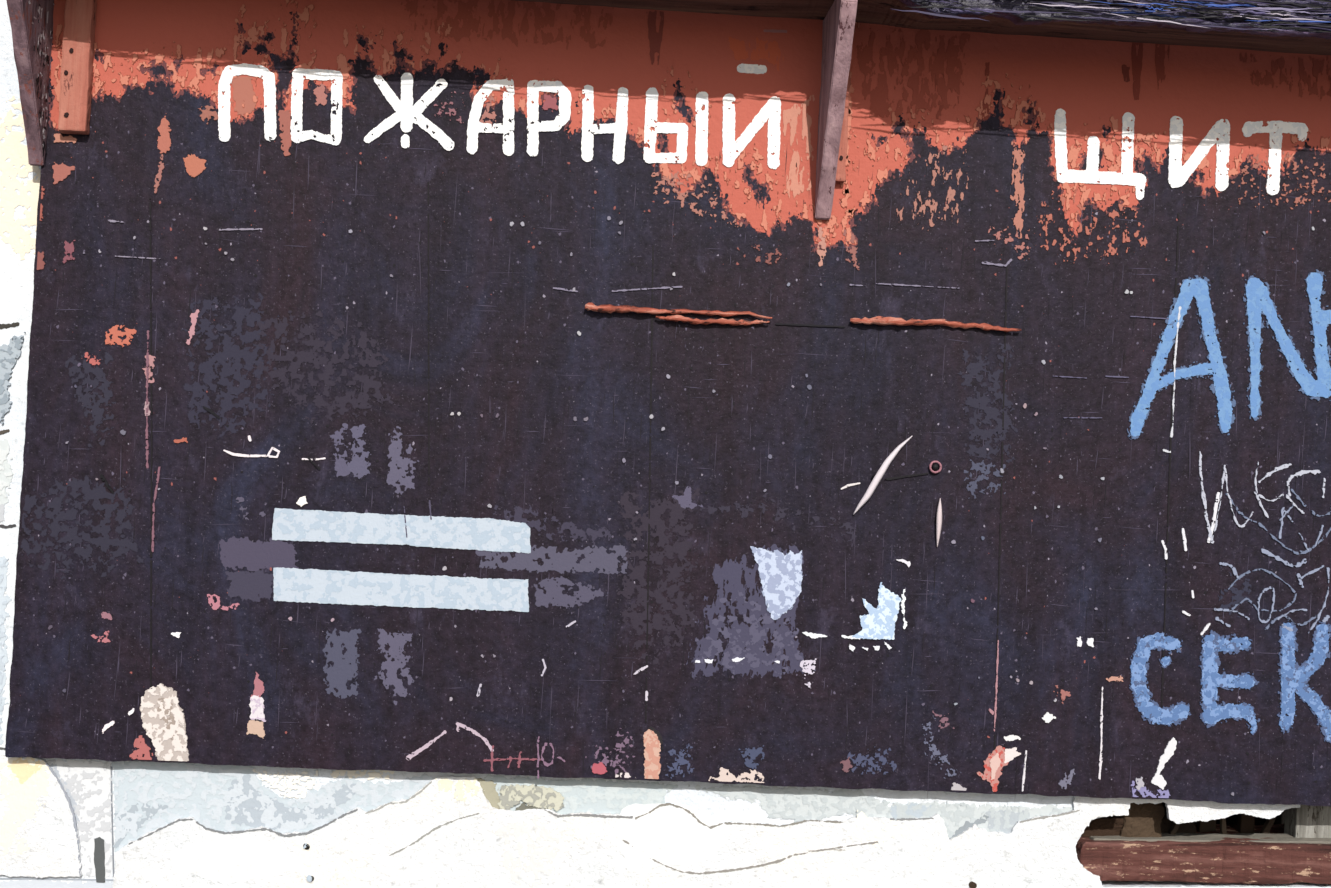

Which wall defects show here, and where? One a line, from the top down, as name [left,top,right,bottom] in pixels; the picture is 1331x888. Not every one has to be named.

flaking render [0,0,77,270]
peeling [92,0,1331,270]
peeling [142,355,156,385]
peeling [174,293,402,444]
peeling [957,343,1018,466]
peeling [0,325,144,745]
peeling [207,594,240,611]
peeling [246,672,266,738]